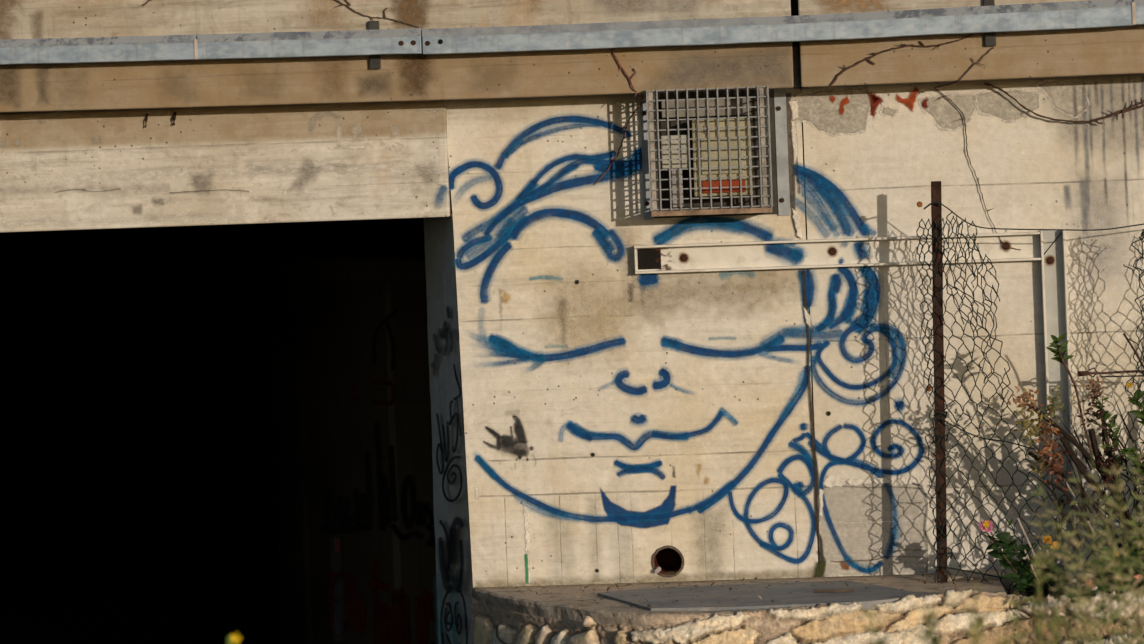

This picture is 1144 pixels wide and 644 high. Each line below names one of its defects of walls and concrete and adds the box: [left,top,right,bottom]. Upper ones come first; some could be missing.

corrosion [830,96,849,115]
peeling [792,87,899,136]
corrosion [867,93,883,116]
corrosion [897,87,928,111]
peeling [918,79,1089,131]